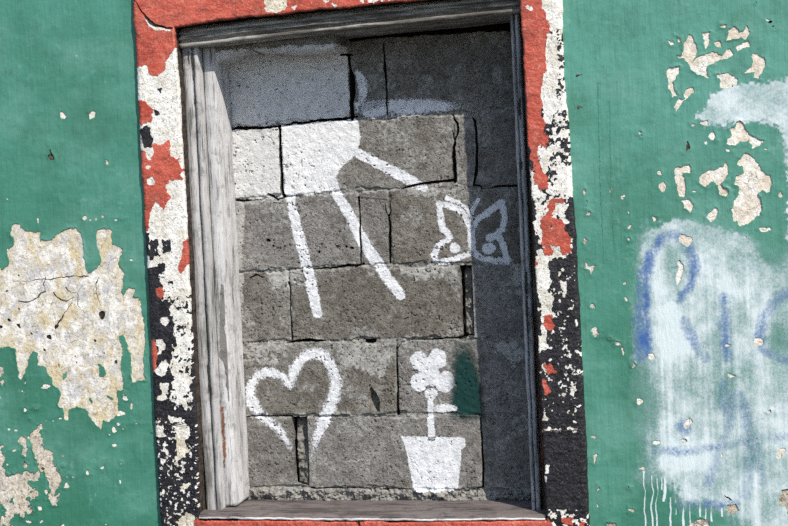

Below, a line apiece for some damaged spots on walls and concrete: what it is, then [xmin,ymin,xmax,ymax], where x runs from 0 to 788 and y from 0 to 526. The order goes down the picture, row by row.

crack [145,19,171,31]
peeling [264,0,297,13]
peeling [666,24,766,113]
peeling [519,0,596,433]
peeling [657,120,783,232]
peeling [137,48,200,526]
peeling [0,215,146,526]
peeling [219,284,230,407]
spalling [369,387,380,411]
peeling [548,509,590,526]
spalling [689,518,710,526]